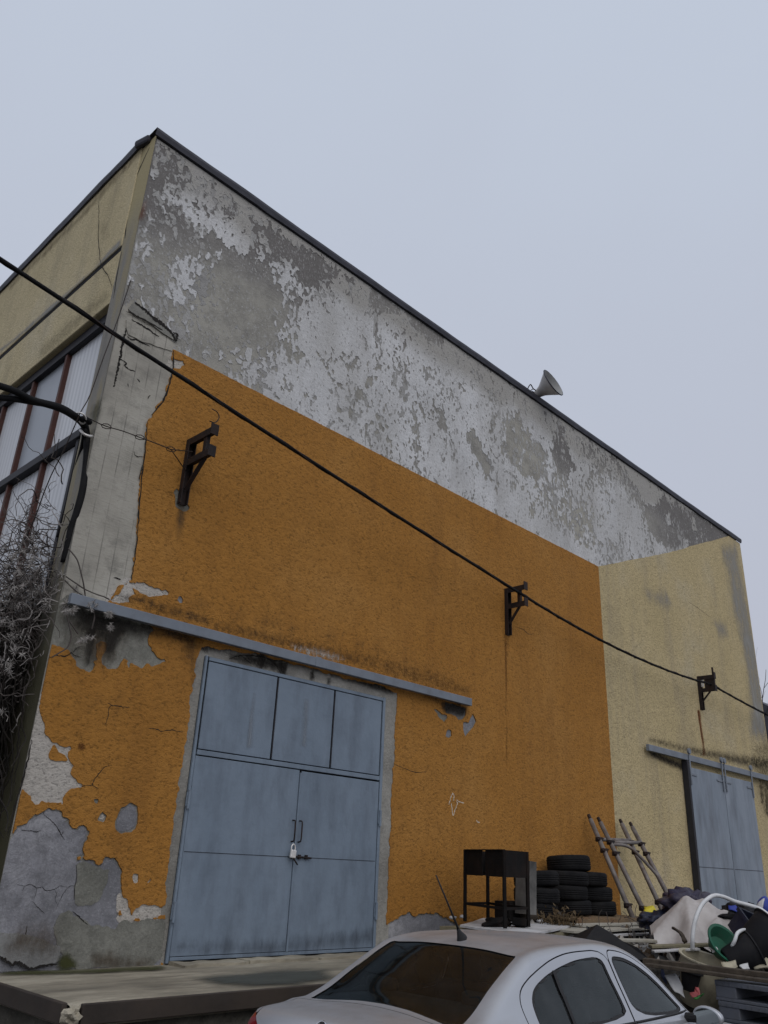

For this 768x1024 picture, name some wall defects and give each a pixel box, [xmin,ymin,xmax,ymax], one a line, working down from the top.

crack [98,205,179,580]
peeling [121,138,728,564]
spalling [50,578,182,672]
spalling [434,702,475,737]
leakage [724,551,766,736]
crack [17,865,88,935]
spalling [0,694,166,973]